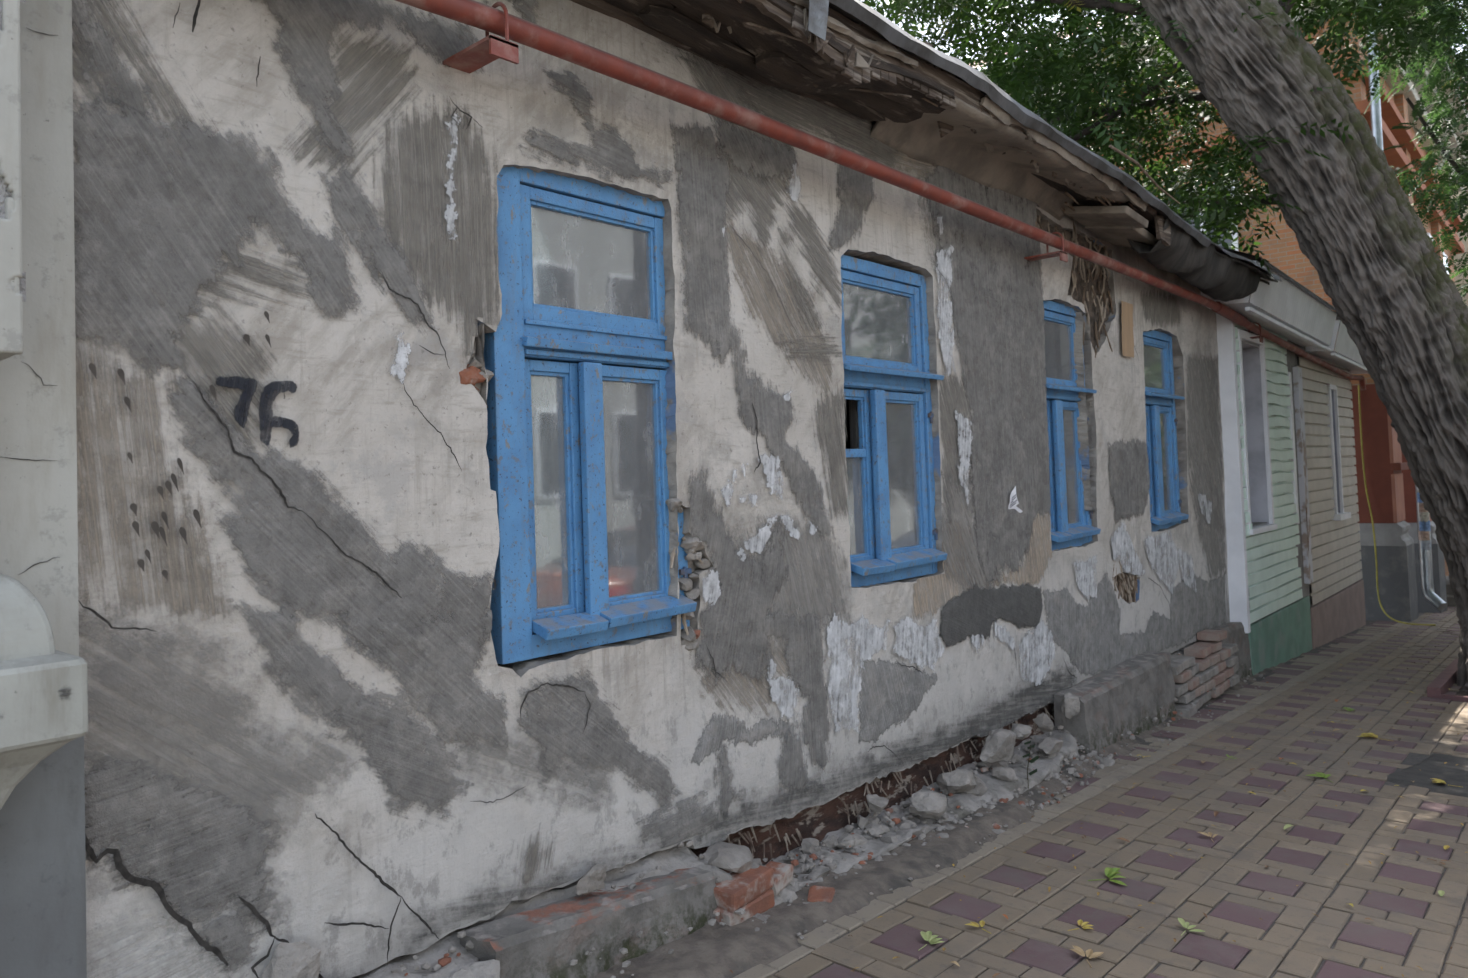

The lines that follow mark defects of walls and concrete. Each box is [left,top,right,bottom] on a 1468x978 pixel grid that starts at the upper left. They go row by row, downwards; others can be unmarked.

spalling [0,177,12,219]
crack [187,375,402,598]
peeling [955,410,973,504]
peeling [767,659,799,719]
peeling [826,513,1055,733]
peeling [1074,522,1197,602]
crack [85,833,289,978]
crack [315,813,439,964]